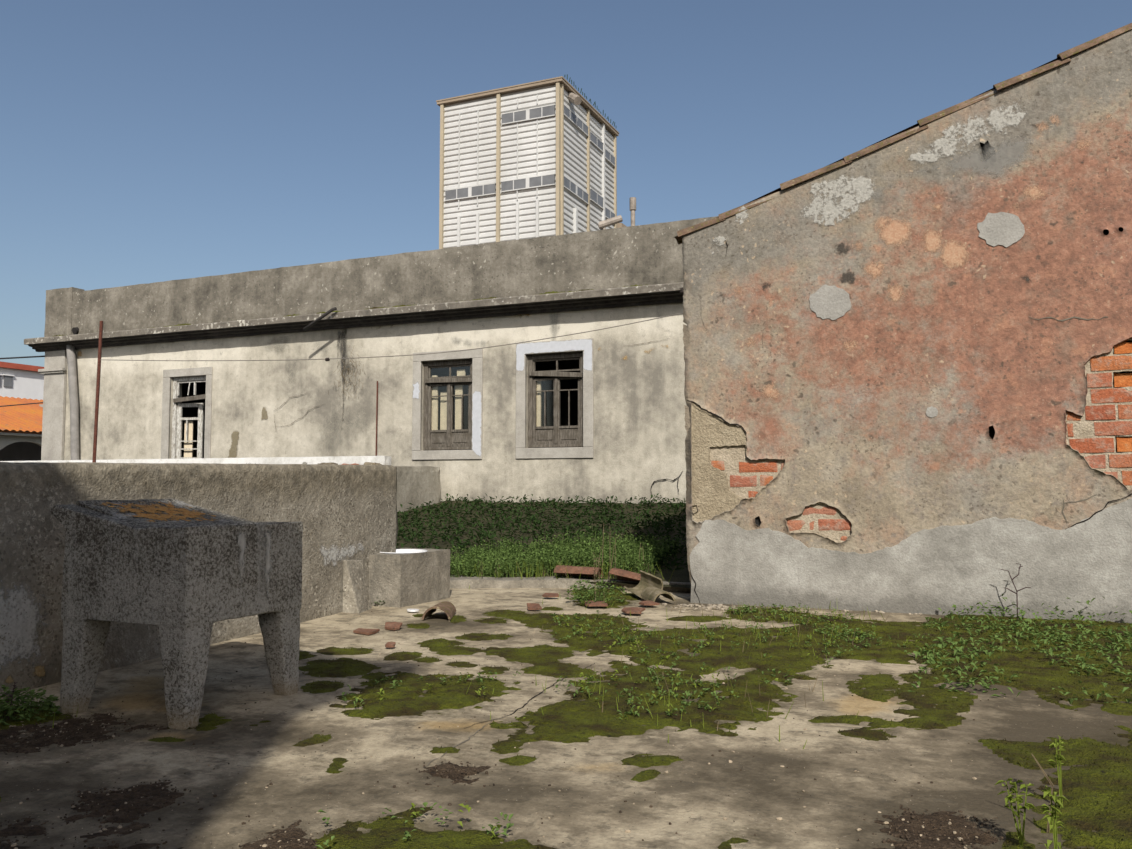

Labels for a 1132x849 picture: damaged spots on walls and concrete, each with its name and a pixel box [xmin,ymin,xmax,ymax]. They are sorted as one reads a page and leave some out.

crack [274,330,345,430]
water stain [338,330,349,383]
spalling [684,402,785,522]
flaking render [1066,338,1132,490]
flaking render [786,502,852,542]
crack [426,663,595,766]